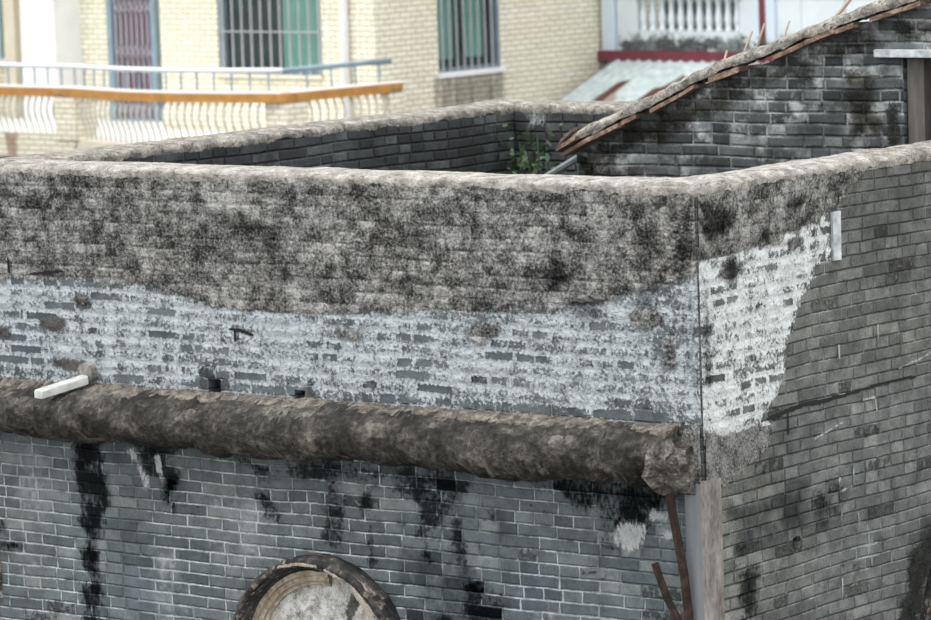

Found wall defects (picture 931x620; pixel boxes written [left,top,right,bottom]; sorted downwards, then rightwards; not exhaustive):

flaking render [0,166,877,488]
crack [759,375,916,435]
leakage [68,442,111,620]
leakage [130,445,181,514]
leakage [239,459,470,566]
leakage [552,479,665,551]
leakage [463,580,504,620]